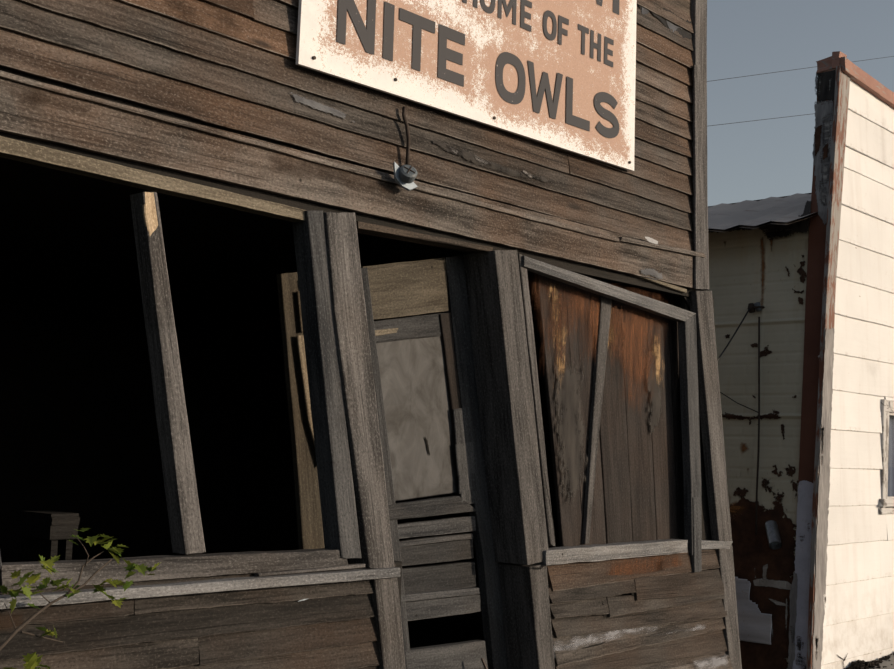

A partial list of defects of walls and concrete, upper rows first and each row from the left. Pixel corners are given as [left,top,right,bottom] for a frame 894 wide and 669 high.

peeling [812,70,836,225]
peeling [753,328,834,669]